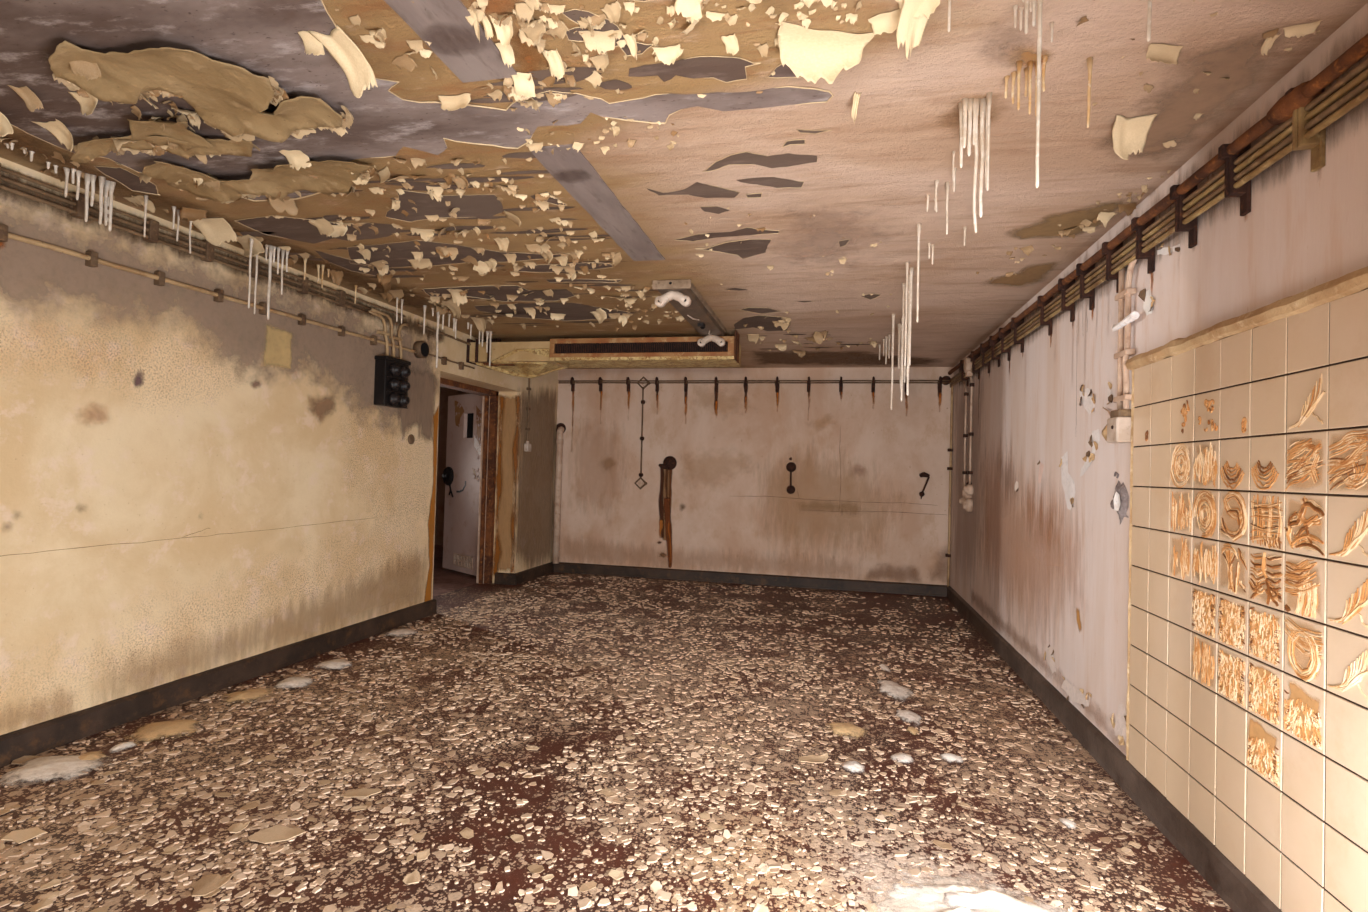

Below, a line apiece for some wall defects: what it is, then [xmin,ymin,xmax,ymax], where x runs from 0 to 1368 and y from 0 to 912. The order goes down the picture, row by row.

leakage [1137,40,1264,156]
peeling [0,0,862,333]
leakage [0,211,436,439]
peeling [733,301,888,358]
spalling [1037,382,1113,510]
crack [2,517,378,556]
corrosion [659,468,672,567]
spalling [1110,472,1129,524]
leakage [223,659,351,702]
spalling [1043,644,1092,708]
leakage [0,720,199,783]
leakage [876,874,1065,912]